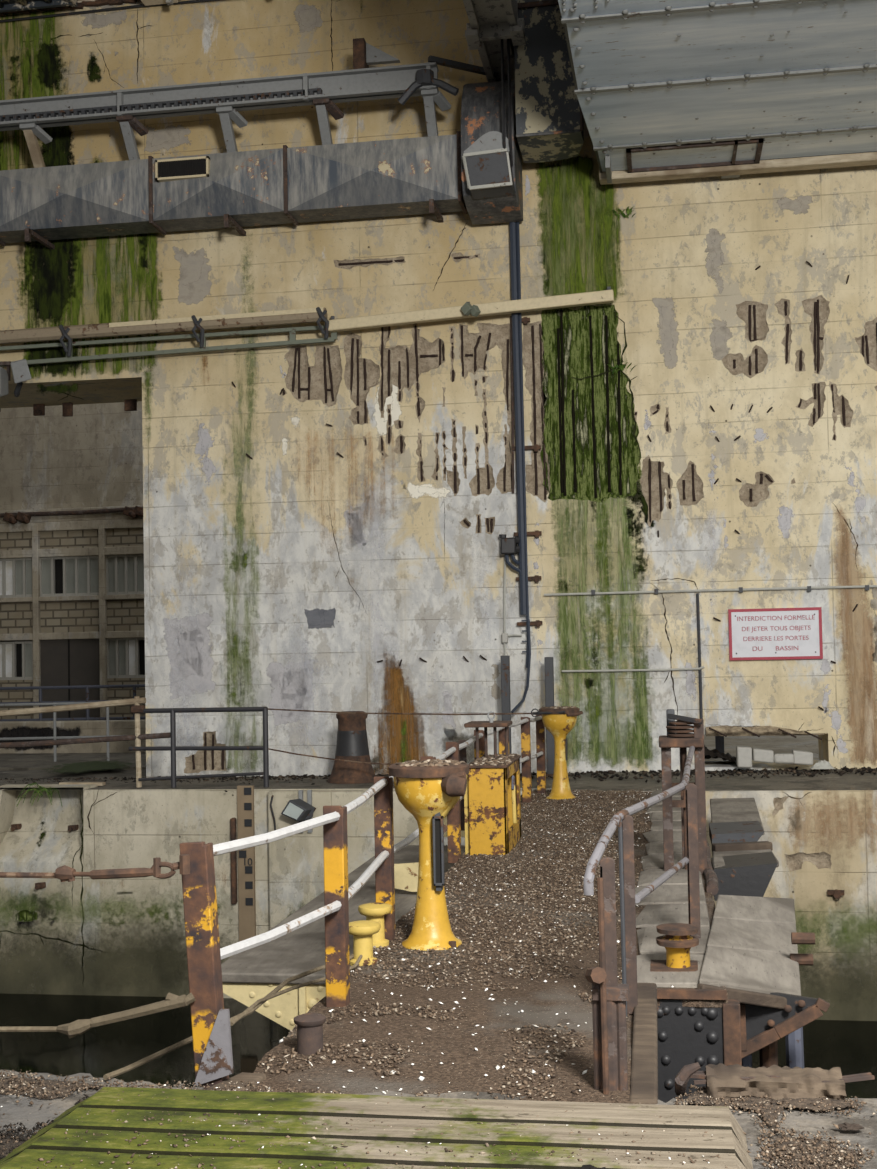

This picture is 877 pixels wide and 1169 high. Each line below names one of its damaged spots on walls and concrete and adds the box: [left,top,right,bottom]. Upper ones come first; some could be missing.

damp [42,126,75,167]
damp [537,156,620,299]
damp [28,342,89,393]
spalling [280,297,718,526]
spalling [710,295,853,443]
spalling [855,317,877,391]
damp [627,463,655,578]
spalling [739,471,775,507]
peeling [778,505,795,538]
corrosion [374,654,426,775]
damp [0,897,189,997]
damp [795,913,877,1021]